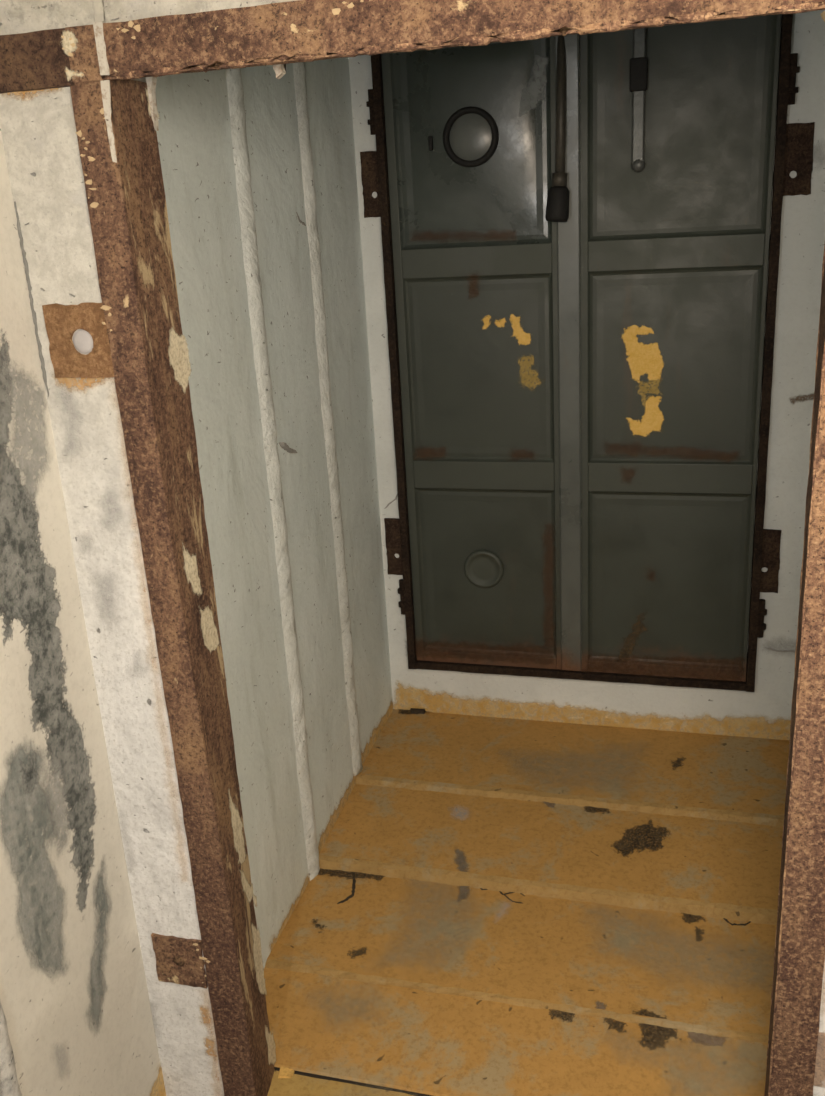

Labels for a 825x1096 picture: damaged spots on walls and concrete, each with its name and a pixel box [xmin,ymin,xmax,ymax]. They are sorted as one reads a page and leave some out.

water stain [0,330,109,1027]